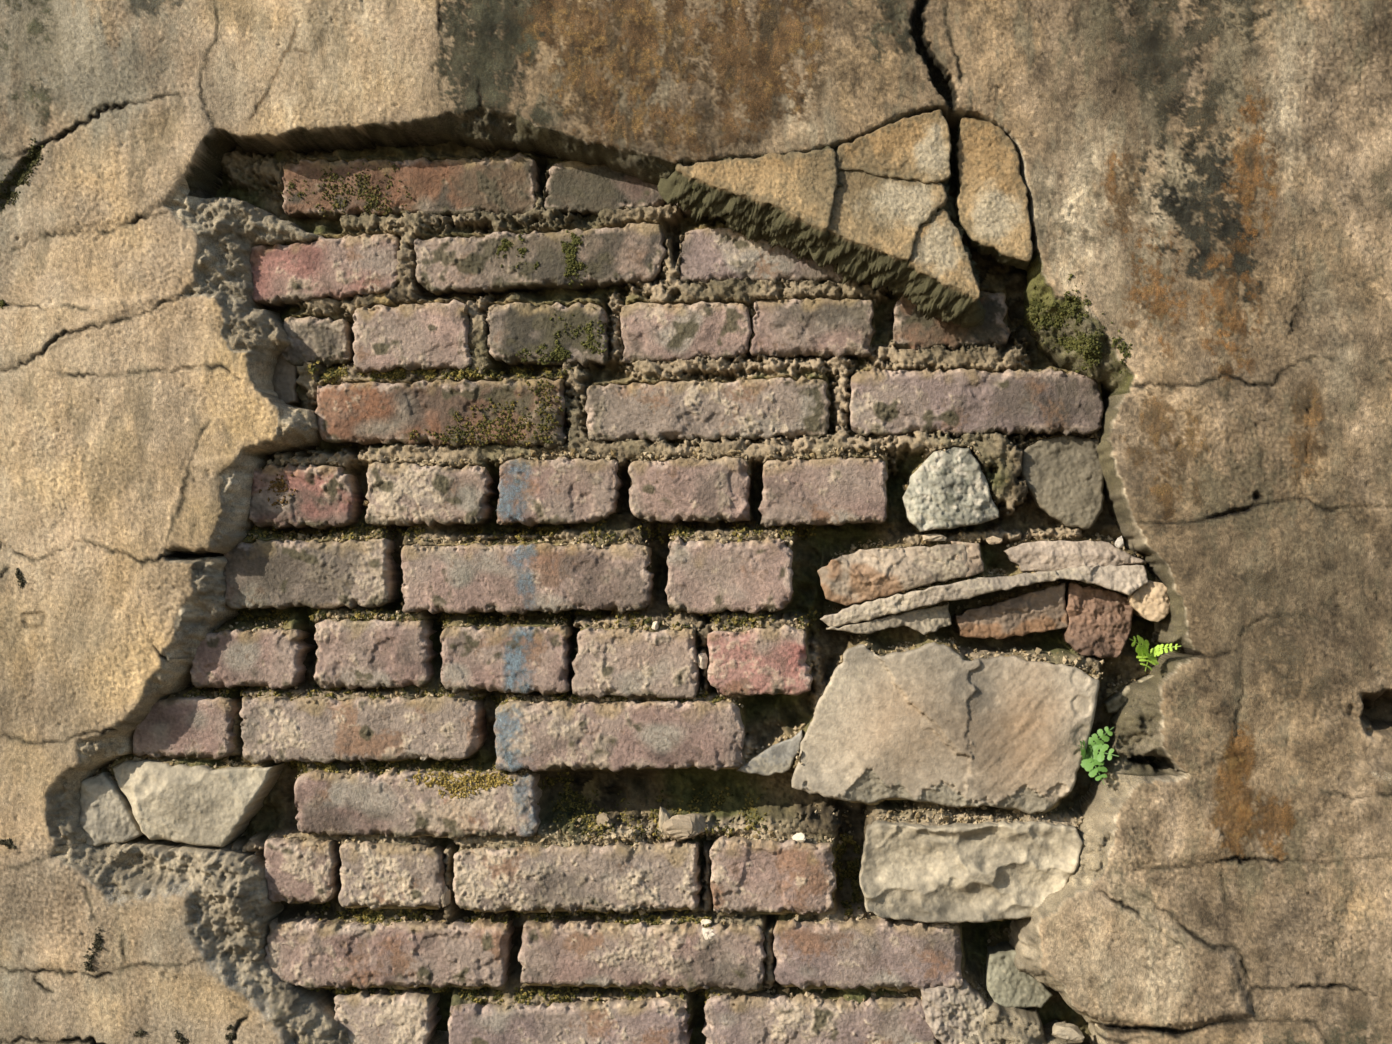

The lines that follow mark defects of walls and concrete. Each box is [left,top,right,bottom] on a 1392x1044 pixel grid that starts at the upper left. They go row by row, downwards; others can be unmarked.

crack [910,0,962,112]
crack [0,95,166,212]
water stain [1109,0,1271,305]
crack [3,300,170,378]
peeling [167,107,1134,559]
crack [1157,454,1334,524]
crack [91,542,223,563]
spalling [48,590,239,902]
spalling [1032,546,1192,917]
spalling [243,852,266,875]
crack [8,1036,97,1044]
spalling [986,969,1107,1044]